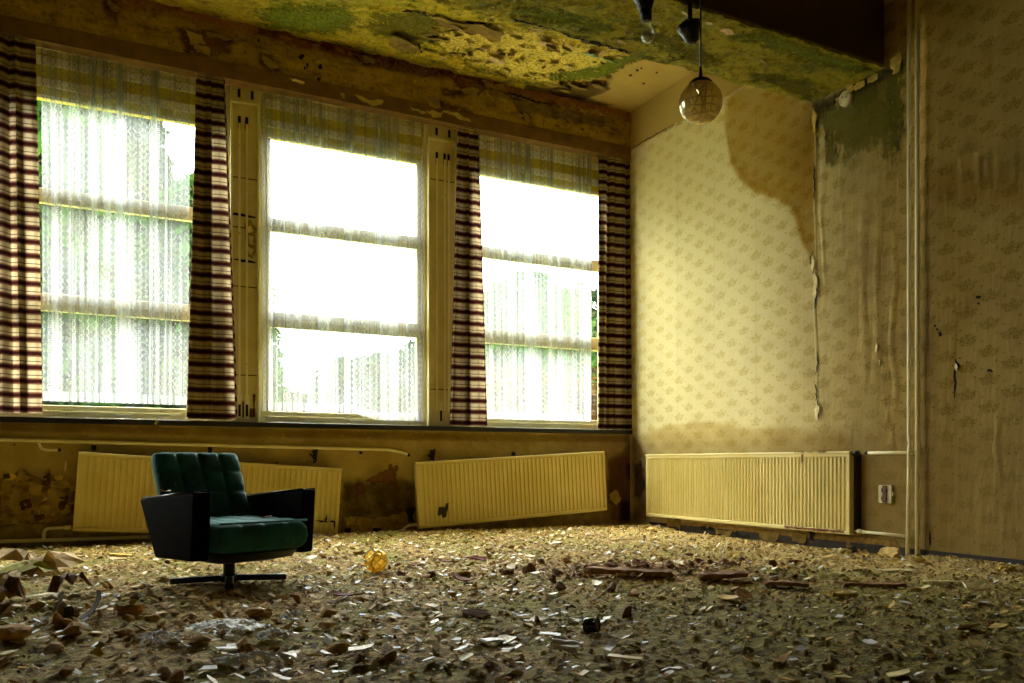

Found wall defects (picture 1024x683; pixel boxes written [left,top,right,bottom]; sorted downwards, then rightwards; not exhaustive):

peeling [179,28,232,58]
spalling [290,54,323,84]
peeling [350,25,629,135]
spalling [815,52,902,109]
damp [755,68,906,170]
peeling [0,468,76,526]
spalling [342,505,417,533]